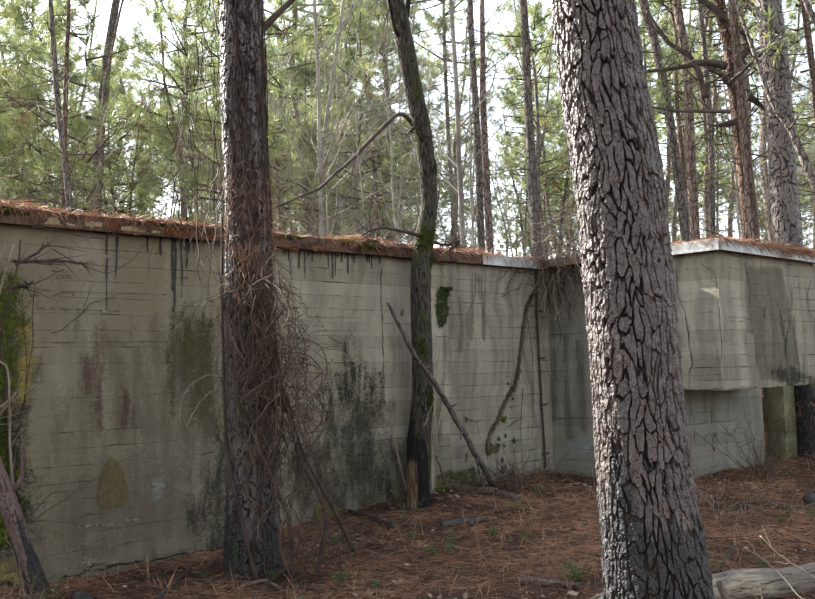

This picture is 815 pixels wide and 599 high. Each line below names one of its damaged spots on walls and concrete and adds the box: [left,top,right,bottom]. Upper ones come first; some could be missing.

damp [105,235,119,310]
damp [159,238,224,436]